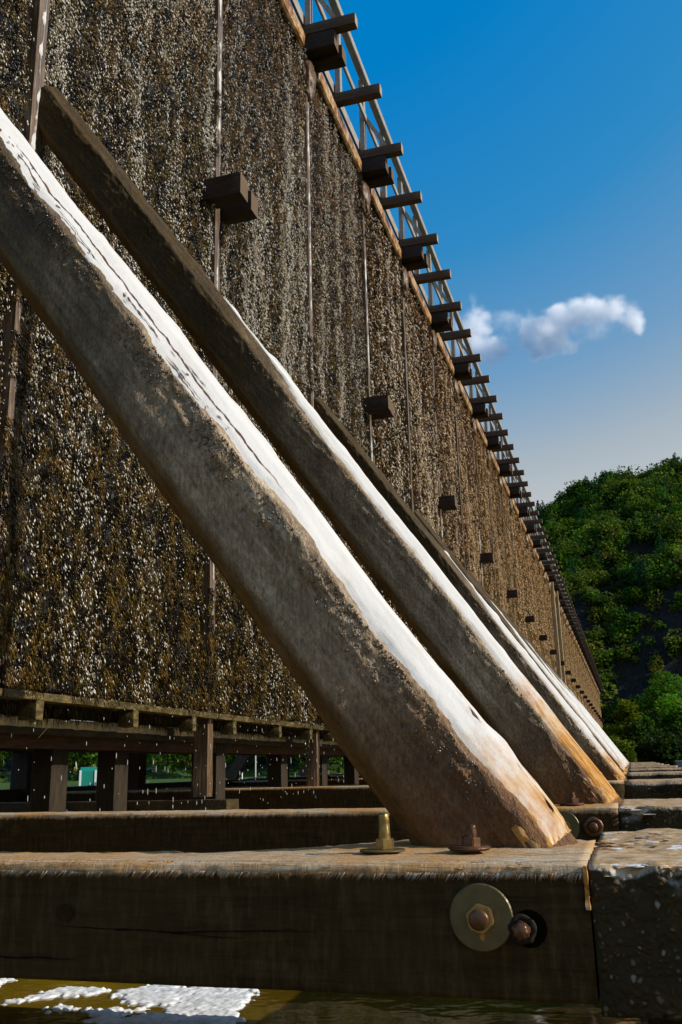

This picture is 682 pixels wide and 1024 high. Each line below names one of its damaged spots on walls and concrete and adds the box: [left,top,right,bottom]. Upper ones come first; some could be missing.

rust [511,811,571,849]
spalling [601,864,682,878]
crack [55,925,314,939]